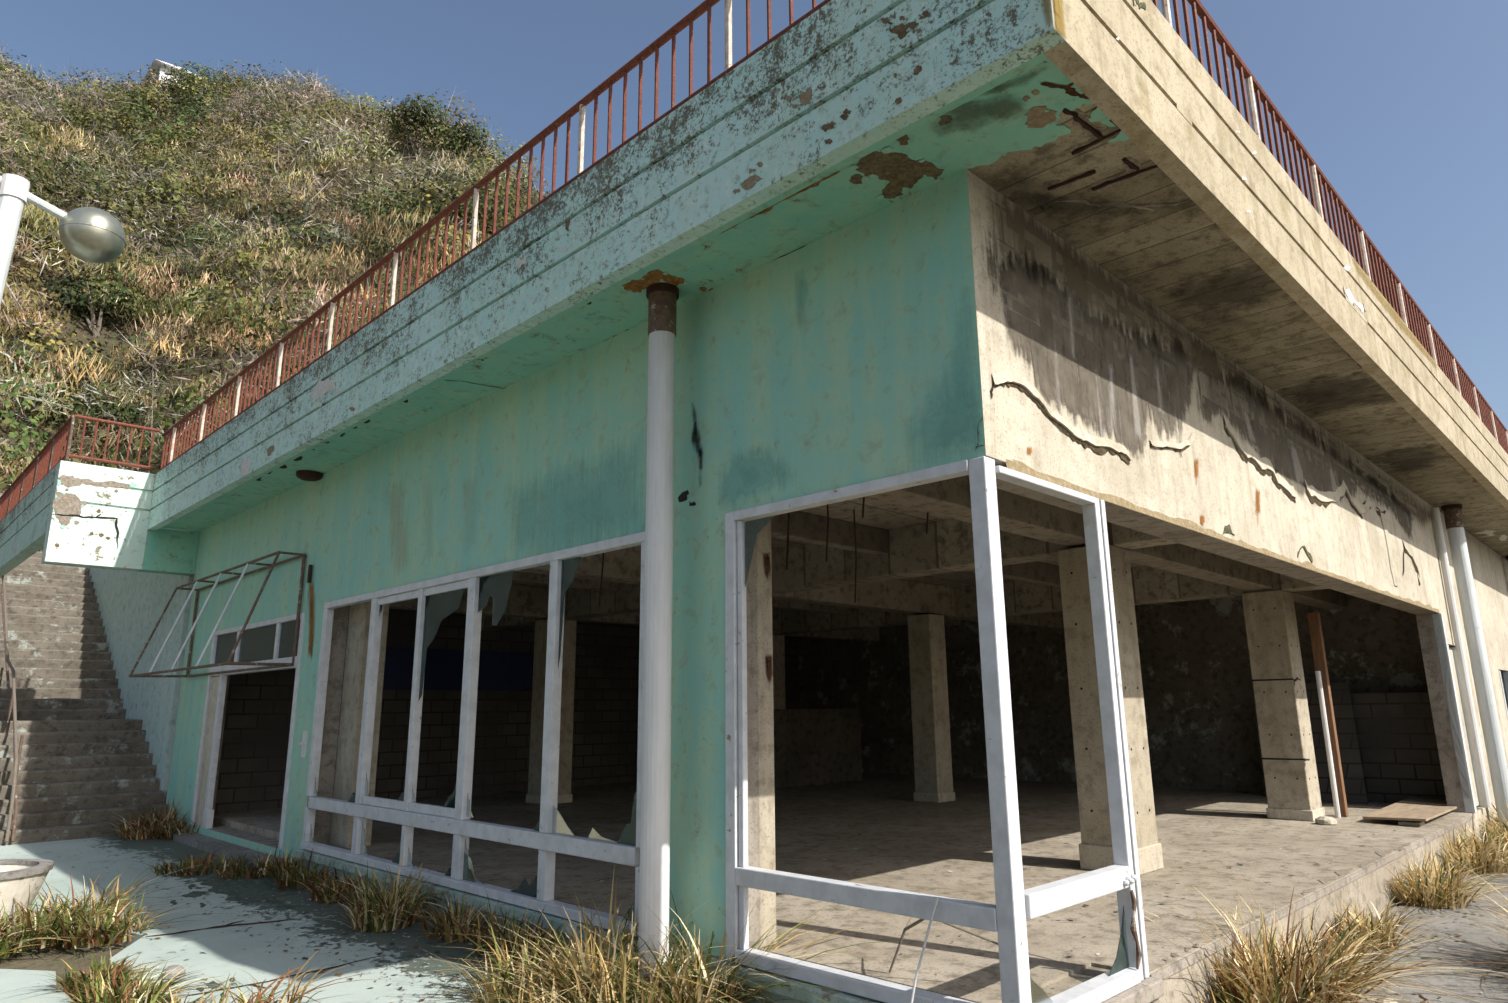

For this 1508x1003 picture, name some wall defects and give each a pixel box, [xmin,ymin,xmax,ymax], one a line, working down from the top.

crack [1040,82,1089,99]
peeling [849,134,944,200]
damp [987,182,1439,537]
peeling [45,475,137,557]
crack [975,371,1421,586]